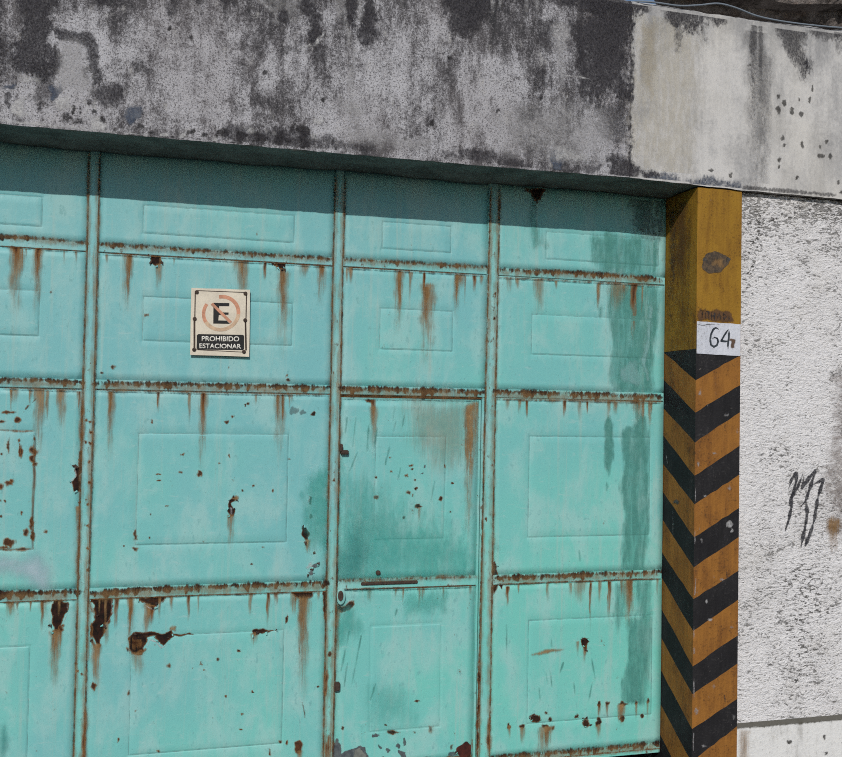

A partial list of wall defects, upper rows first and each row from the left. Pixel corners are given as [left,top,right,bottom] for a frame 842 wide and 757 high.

leakage [12,0,64,83]
leakage [300,0,322,43]
leakage [344,0,382,47]
leakage [92,82,123,108]
leakage [225,125,431,150]
leakage [442,0,842,299]
rust [0,155,663,757]
peeling [332,738,368,757]
peeling [372,724,406,757]